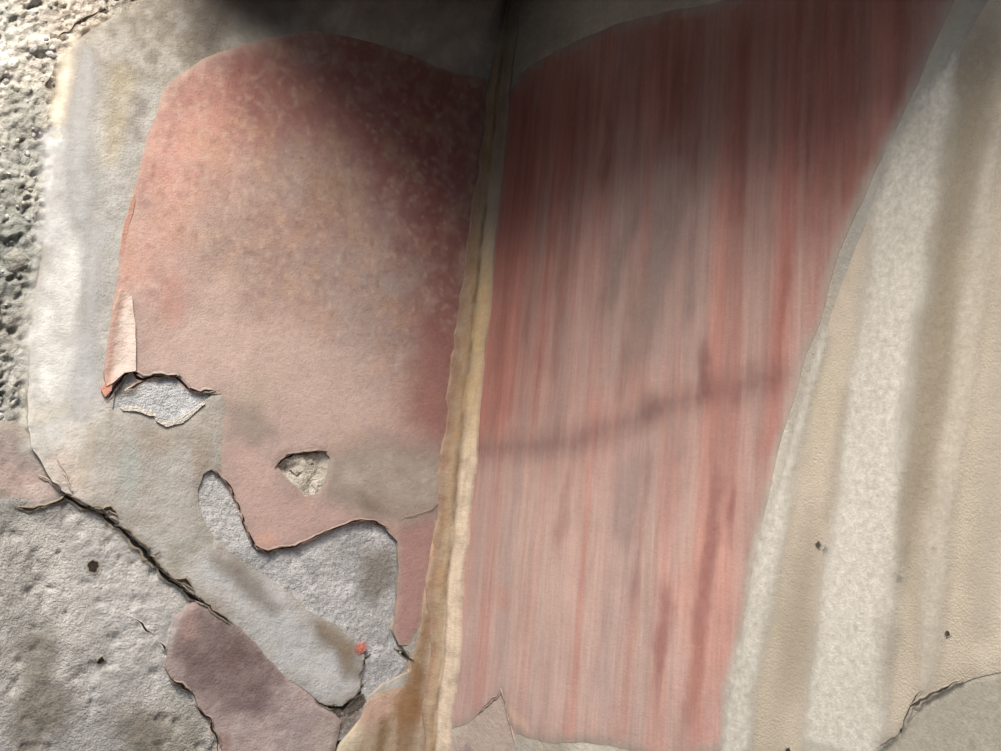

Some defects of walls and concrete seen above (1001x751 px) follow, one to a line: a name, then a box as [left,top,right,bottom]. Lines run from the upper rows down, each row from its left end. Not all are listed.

flaking render [120,194,135,256]
spalling [101,289,211,427]
crack [14,460,235,627]
spalling [198,470,407,741]
spalling [277,453,329,496]
crack [878,678,963,750]